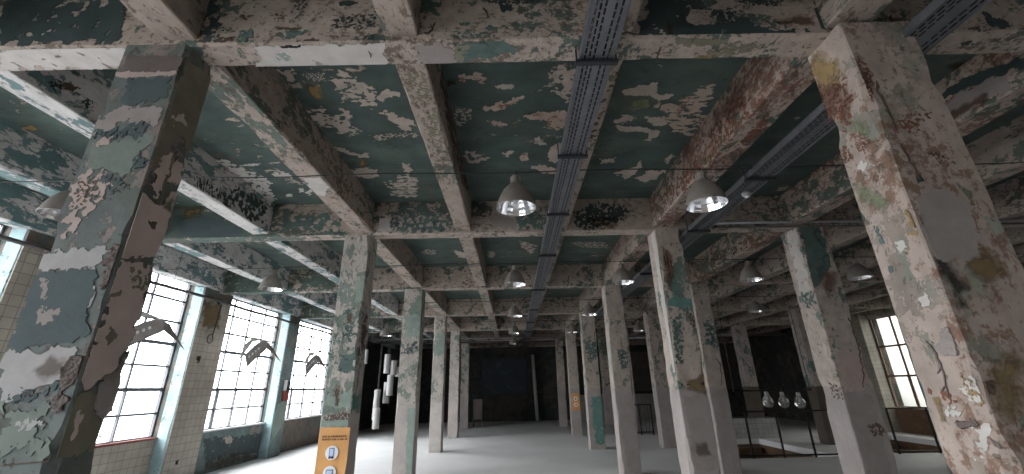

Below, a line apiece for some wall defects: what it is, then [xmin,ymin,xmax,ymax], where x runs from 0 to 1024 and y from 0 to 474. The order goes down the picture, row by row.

peeling [92,104,188,147]
peeling [115,70,176,79]
peeling [275,57,429,141]
peeling [453,72,524,127]
peeling [502,65,576,174]
peeling [592,71,750,157]
peeling [60,168,130,240]
peeling [334,147,419,198]
peeling [600,154,698,206]
spalling [39,355,84,441]
spalling [866,423,942,453]
peeling [944,405,1002,461]